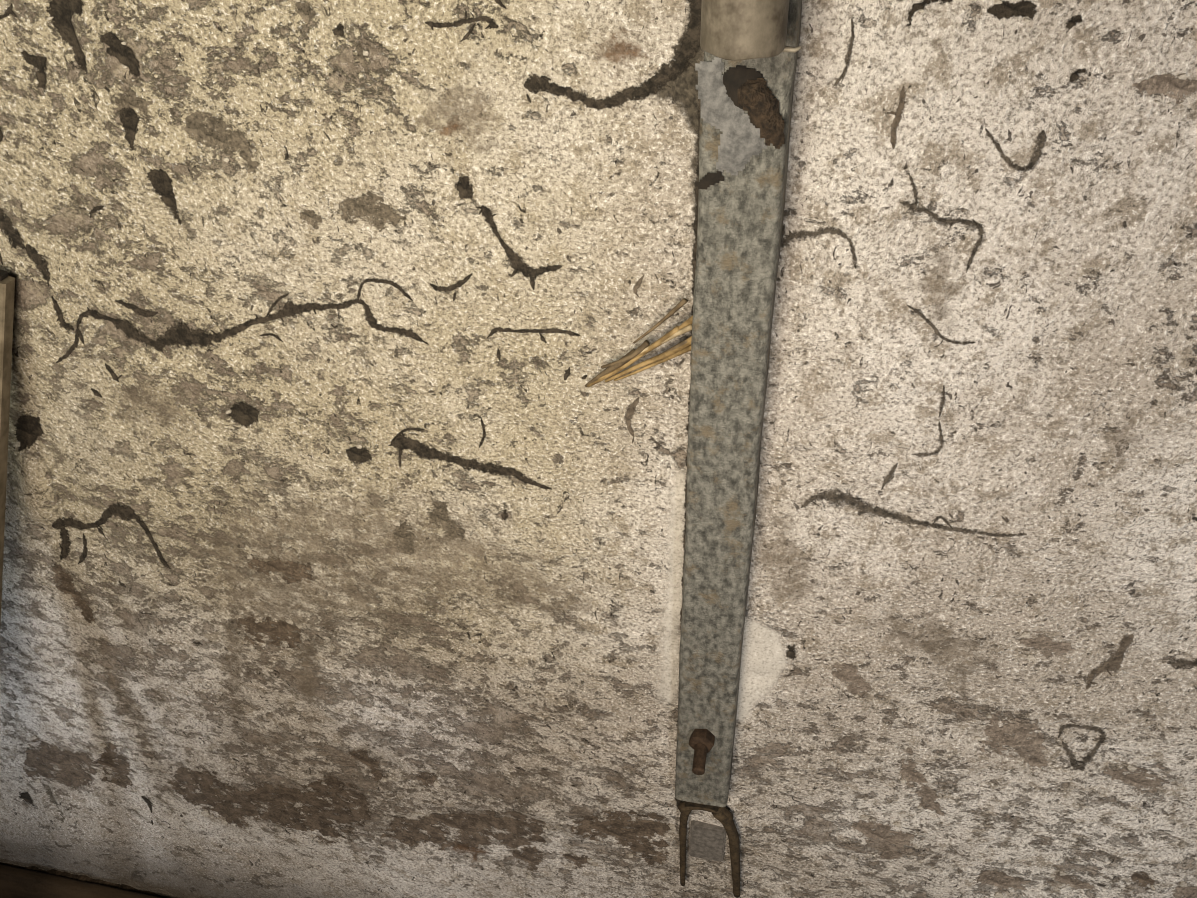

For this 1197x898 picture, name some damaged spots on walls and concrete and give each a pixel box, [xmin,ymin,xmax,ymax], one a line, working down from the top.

crack [523,0,702,110]
crack [0,209,472,363]
crack [476,205,562,290]
crack [679,99,701,654]
crack [388,418,552,490]
crack [624,397,639,443]
crack [801,386,1027,537]
crack [52,500,171,569]
damp [211,498,578,623]
crack [1086,634,1134,689]
crack [1167,659,1197,669]
crack [1058,724,1106,770]